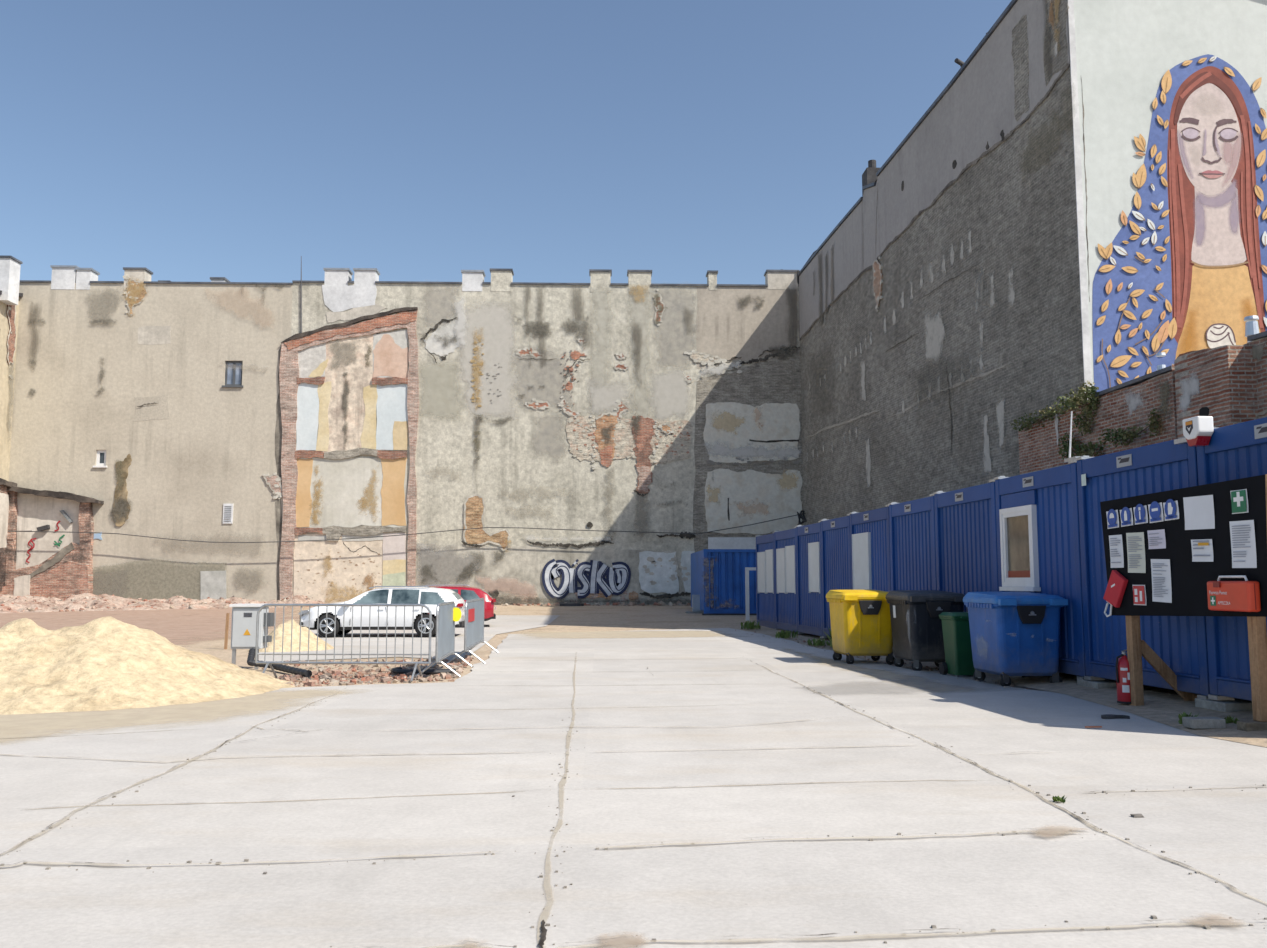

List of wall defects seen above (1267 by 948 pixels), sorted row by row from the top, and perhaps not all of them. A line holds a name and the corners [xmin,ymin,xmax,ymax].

flaking render [123,276,148,316]
peeling [420,317,460,363]
spalling [524,336,693,496]
spalling [110,454,132,526]
flaking render [461,494,511,551]
crack [506,920,547,948]